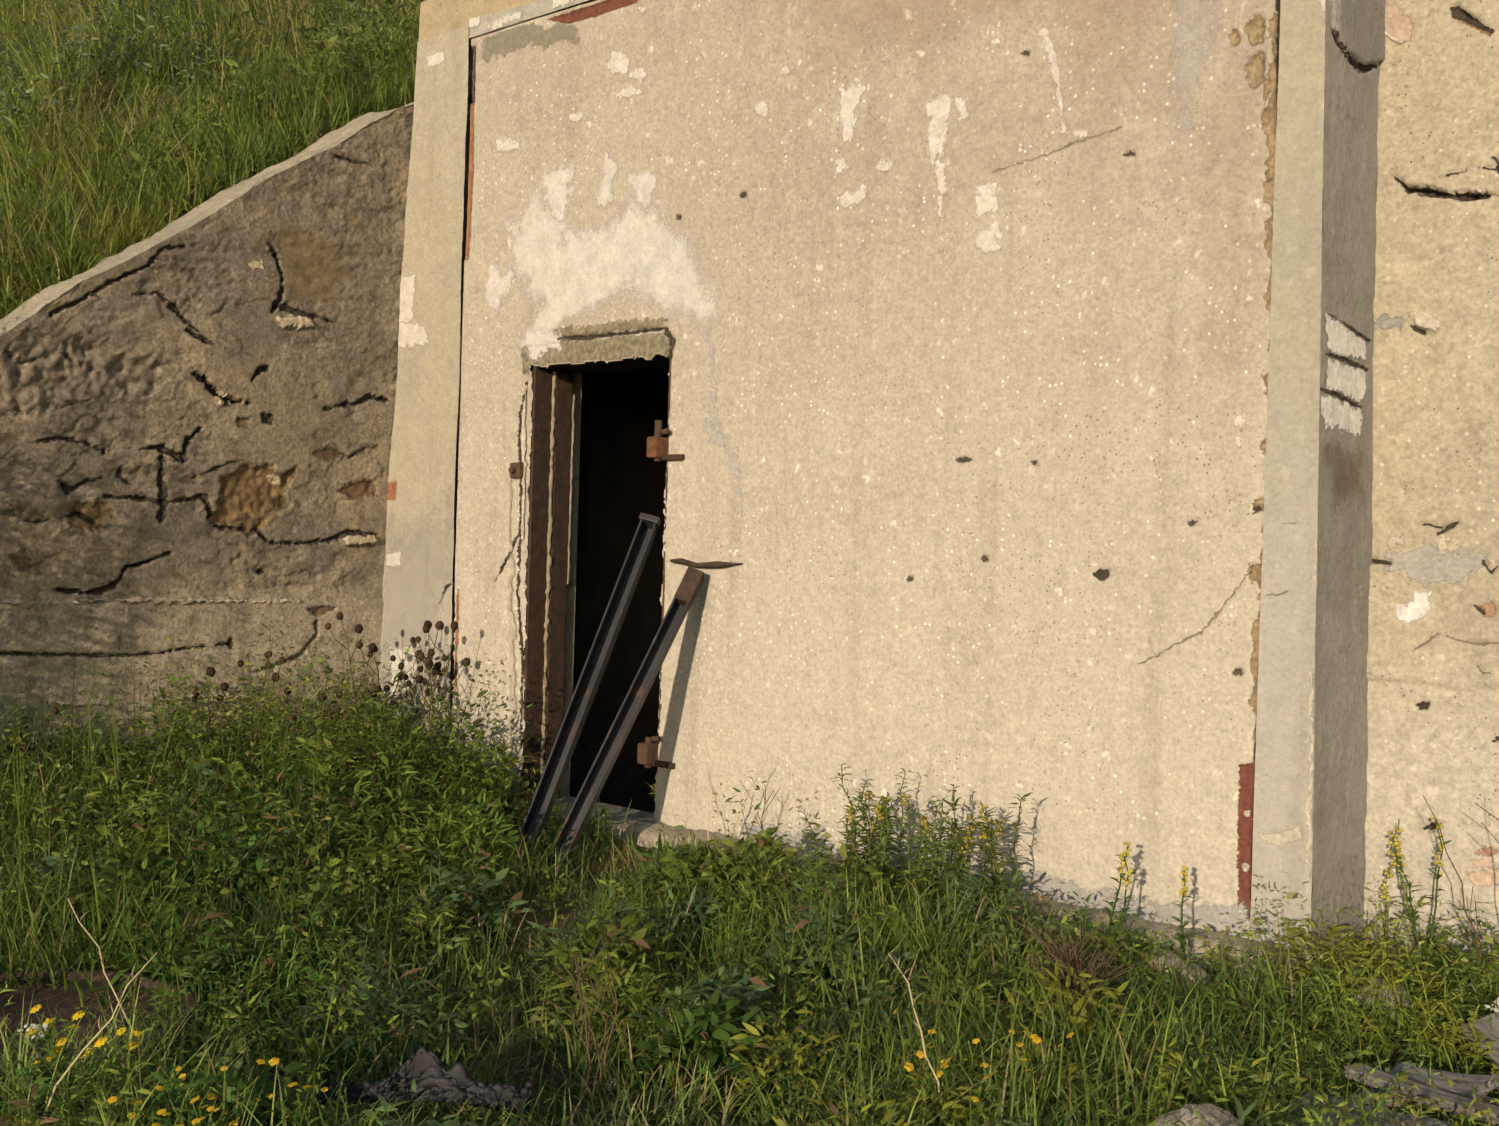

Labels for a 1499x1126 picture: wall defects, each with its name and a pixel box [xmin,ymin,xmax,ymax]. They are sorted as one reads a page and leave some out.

corrosion [548,0,638,24]
spalling [1385,2,1414,45]
spalling [1450,6,1495,37]
corrosion [465,45,476,260]
crack [1392,156,1499,201]
crack [49,245,198,332]
crack [267,244,334,329]
spalling [0,330,164,414]
leakage [485,152,742,516]
crack [24,427,377,595]
crack [0,606,336,671]
corrosion [1236,762,1255,920]